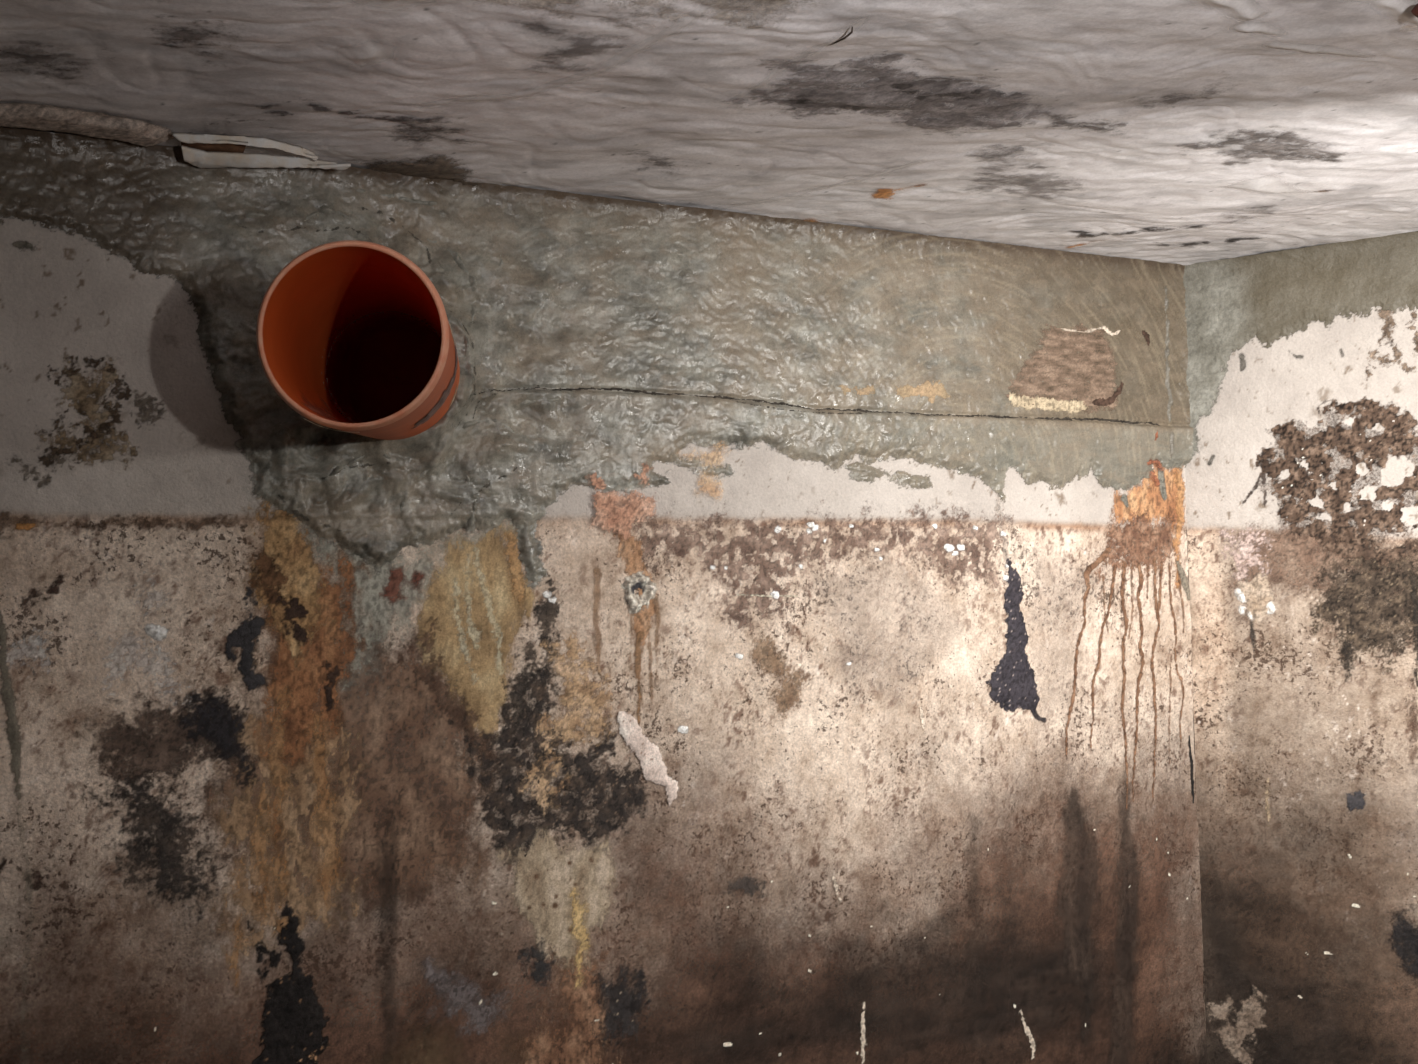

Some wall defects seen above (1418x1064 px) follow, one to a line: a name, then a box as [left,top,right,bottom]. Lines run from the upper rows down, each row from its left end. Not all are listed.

crack [243,207,432,263]
crack [451,311,1160,426]
peeling [1366,309,1418,377]
damp [0,512,239,535]
crack [278,495,349,534]
crack [451,467,517,514]
spalling [1243,397,1418,572]
rust [1065,459,1185,810]
rust [204,501,502,993]
damp [0,525,1418,1064]